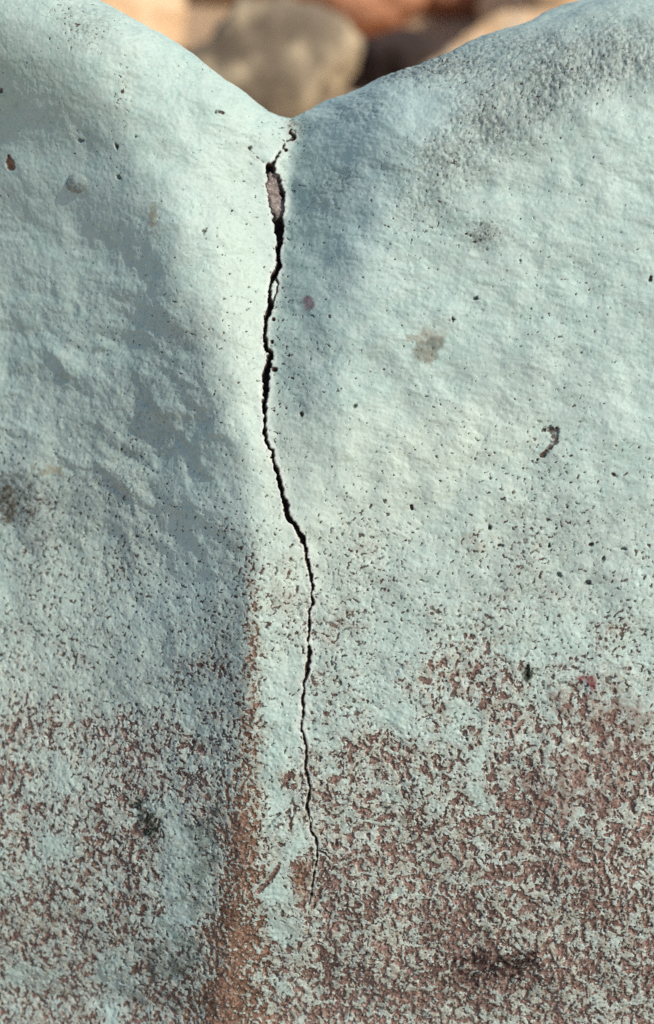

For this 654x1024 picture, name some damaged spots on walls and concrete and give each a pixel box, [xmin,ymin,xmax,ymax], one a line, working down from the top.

spalling [518,25,609,135]
crack [248,125,330,914]
peeling [0,419,654,1024]